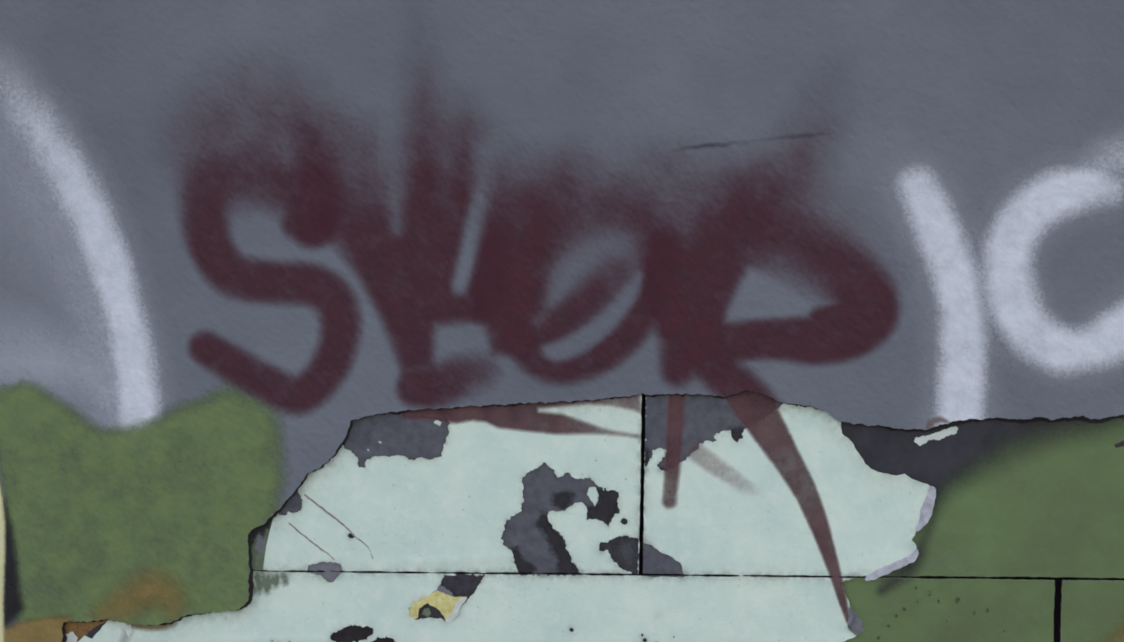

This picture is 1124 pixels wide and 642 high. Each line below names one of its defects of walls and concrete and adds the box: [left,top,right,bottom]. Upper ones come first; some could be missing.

flaking render [62,390,1124,642]